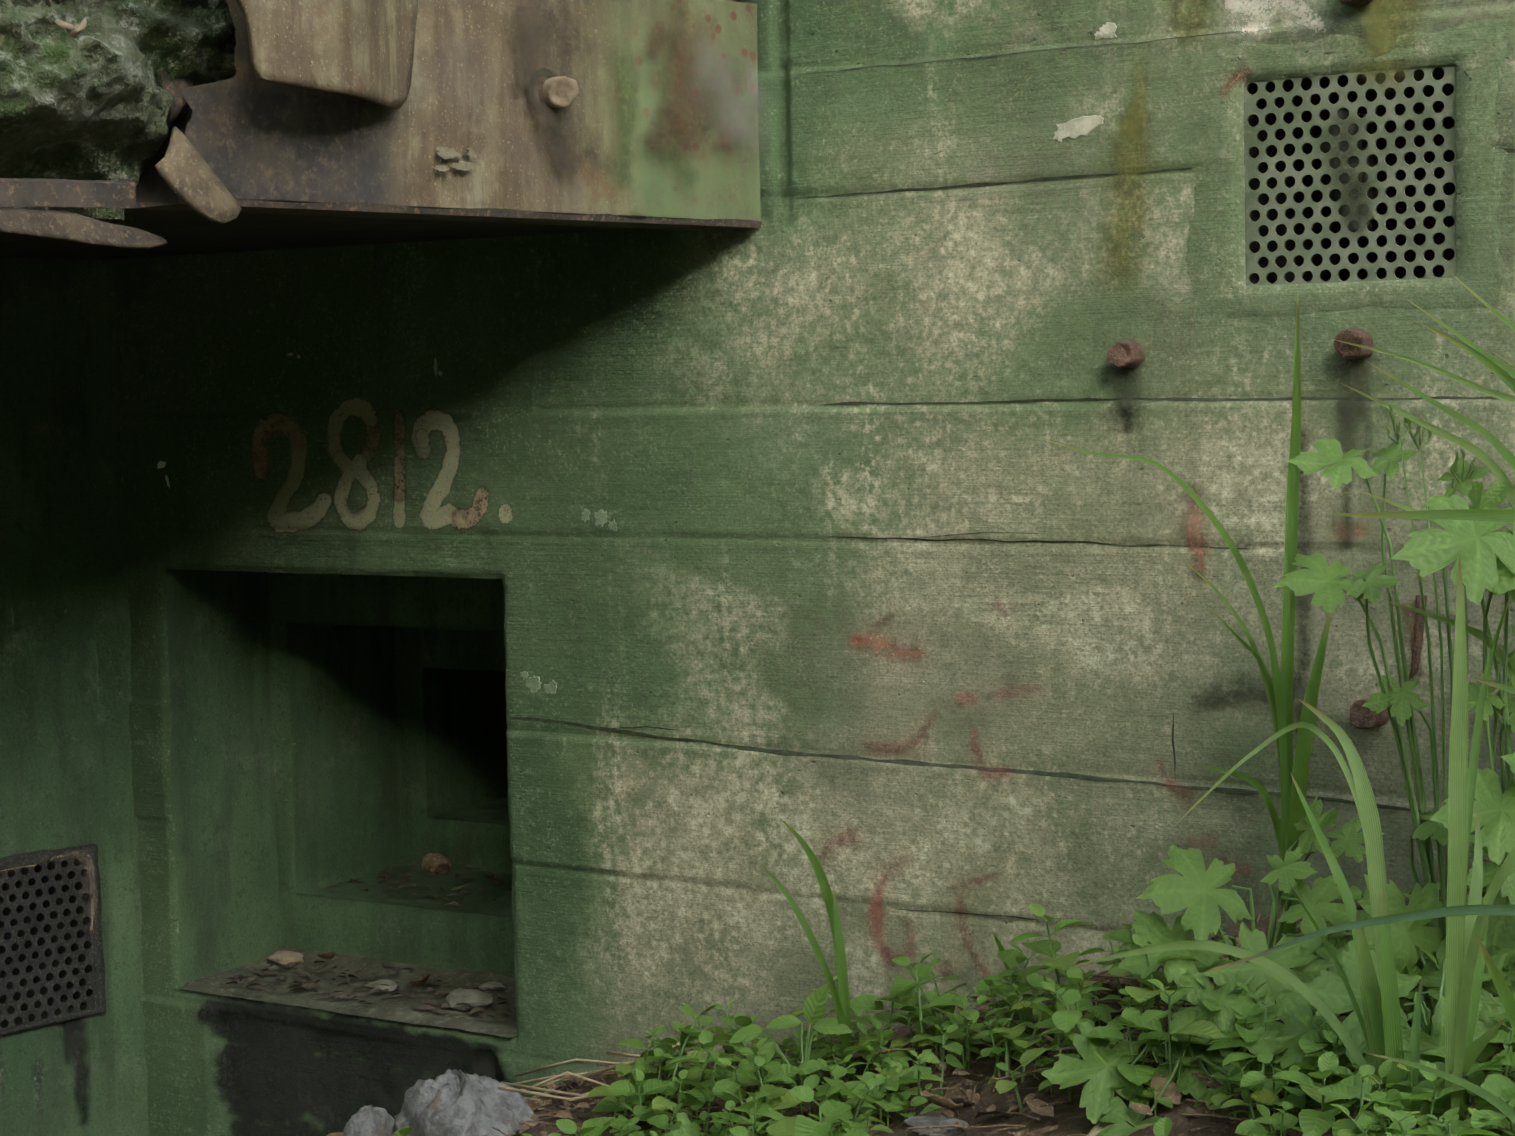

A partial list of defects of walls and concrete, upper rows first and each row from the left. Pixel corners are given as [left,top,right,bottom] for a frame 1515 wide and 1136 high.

peeling [1053,115,1104,142]
damp [63,1005,89,1123]
damp [475,1046,500,1082]